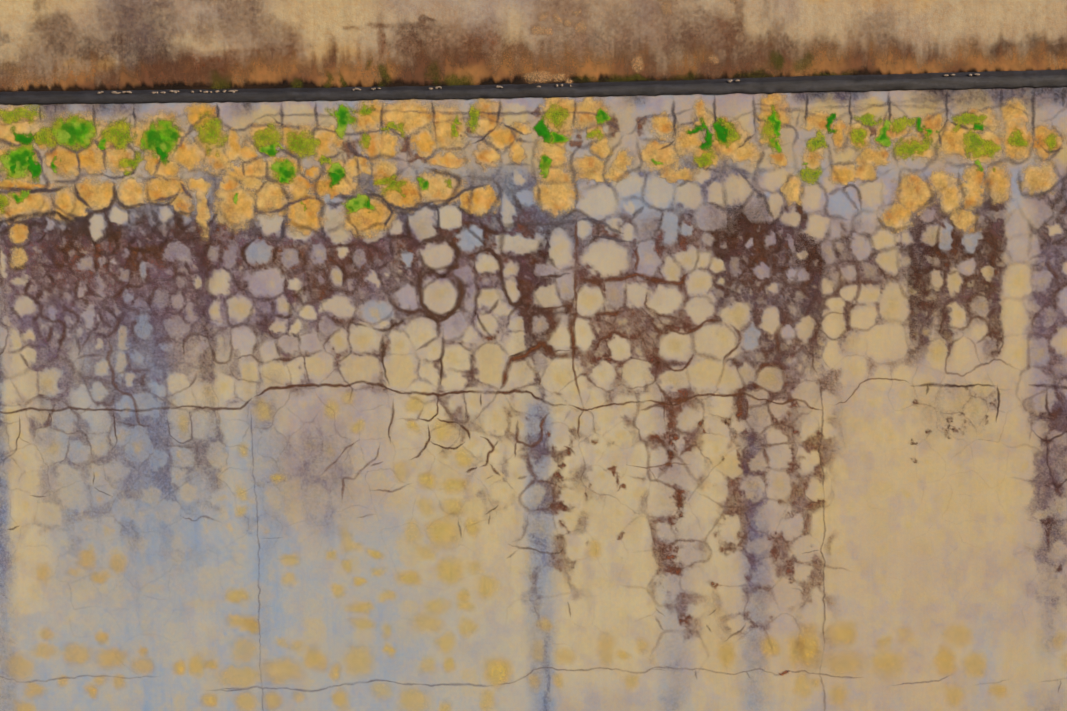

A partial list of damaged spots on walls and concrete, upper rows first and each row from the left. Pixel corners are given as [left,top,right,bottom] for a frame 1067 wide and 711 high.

damp [0,4,1067,118]
damp [0,173,576,405]
crack [0,101,1000,508]
damp [576,221,663,288]
damp [576,306,697,381]
damp [655,192,1006,398]
damp [1034,182,1067,431]
rust [650,432,679,469]
damp [726,384,763,538]
damp [779,431,831,535]
crack [1035,384,1067,489]
rust [662,545,681,574]